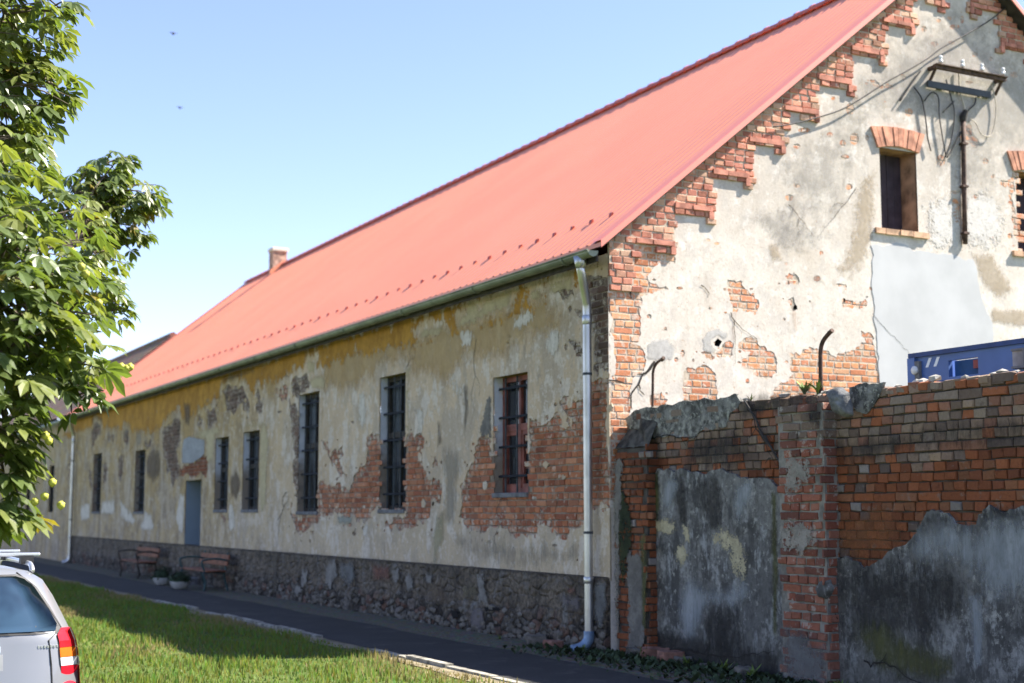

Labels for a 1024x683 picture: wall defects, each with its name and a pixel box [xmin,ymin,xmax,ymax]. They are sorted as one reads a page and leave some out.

spalling [827,132,869,160]
flaking render [778,262,821,320]
flaking render [674,280,880,400]
flaking render [198,385,263,429]
flaking render [459,246,683,547]
flaking render [144,418,208,535]
flaking render [277,373,443,543]
damp [664,477,687,526]
damp [700,479,723,529]
damp [657,580,777,677]
damp [843,508,1024,663]